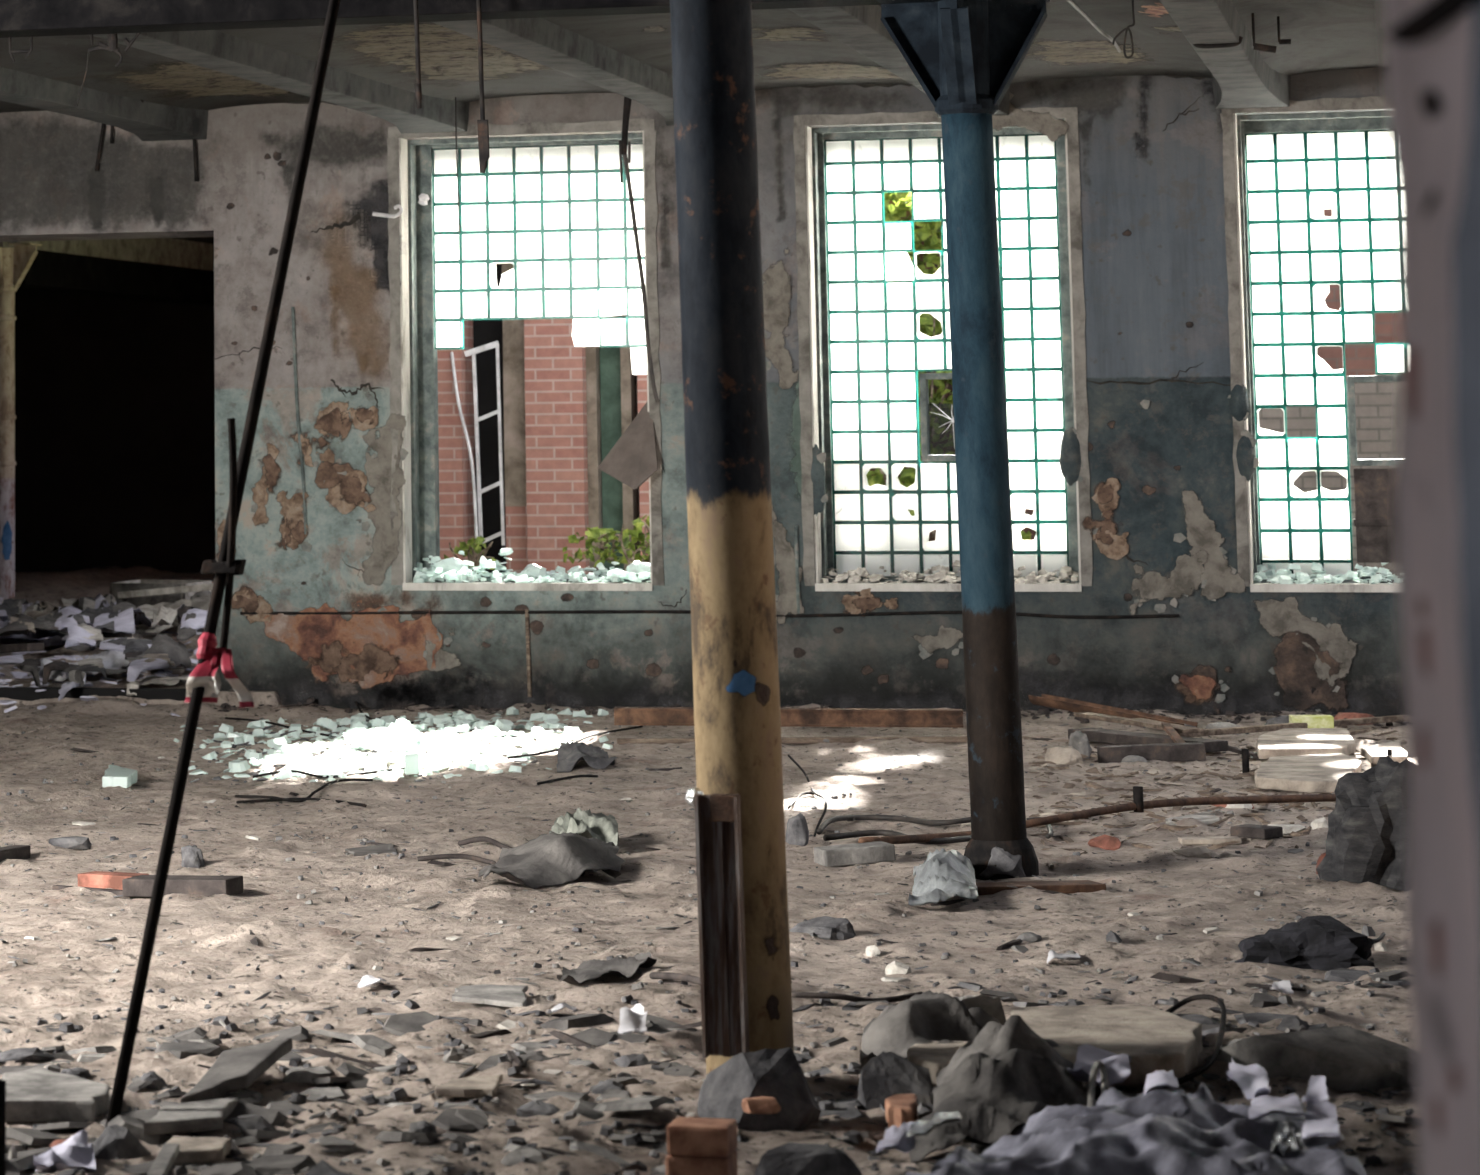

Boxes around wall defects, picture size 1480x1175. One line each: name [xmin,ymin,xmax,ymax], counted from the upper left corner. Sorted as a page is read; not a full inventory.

leakage [108,61,294,99]
leakage [333,23,553,87]
flaking render [251,401,408,586]
flaking render [231,586,461,689]
flaking render [912,625,963,669]
flaking render [1082,477,1357,715]